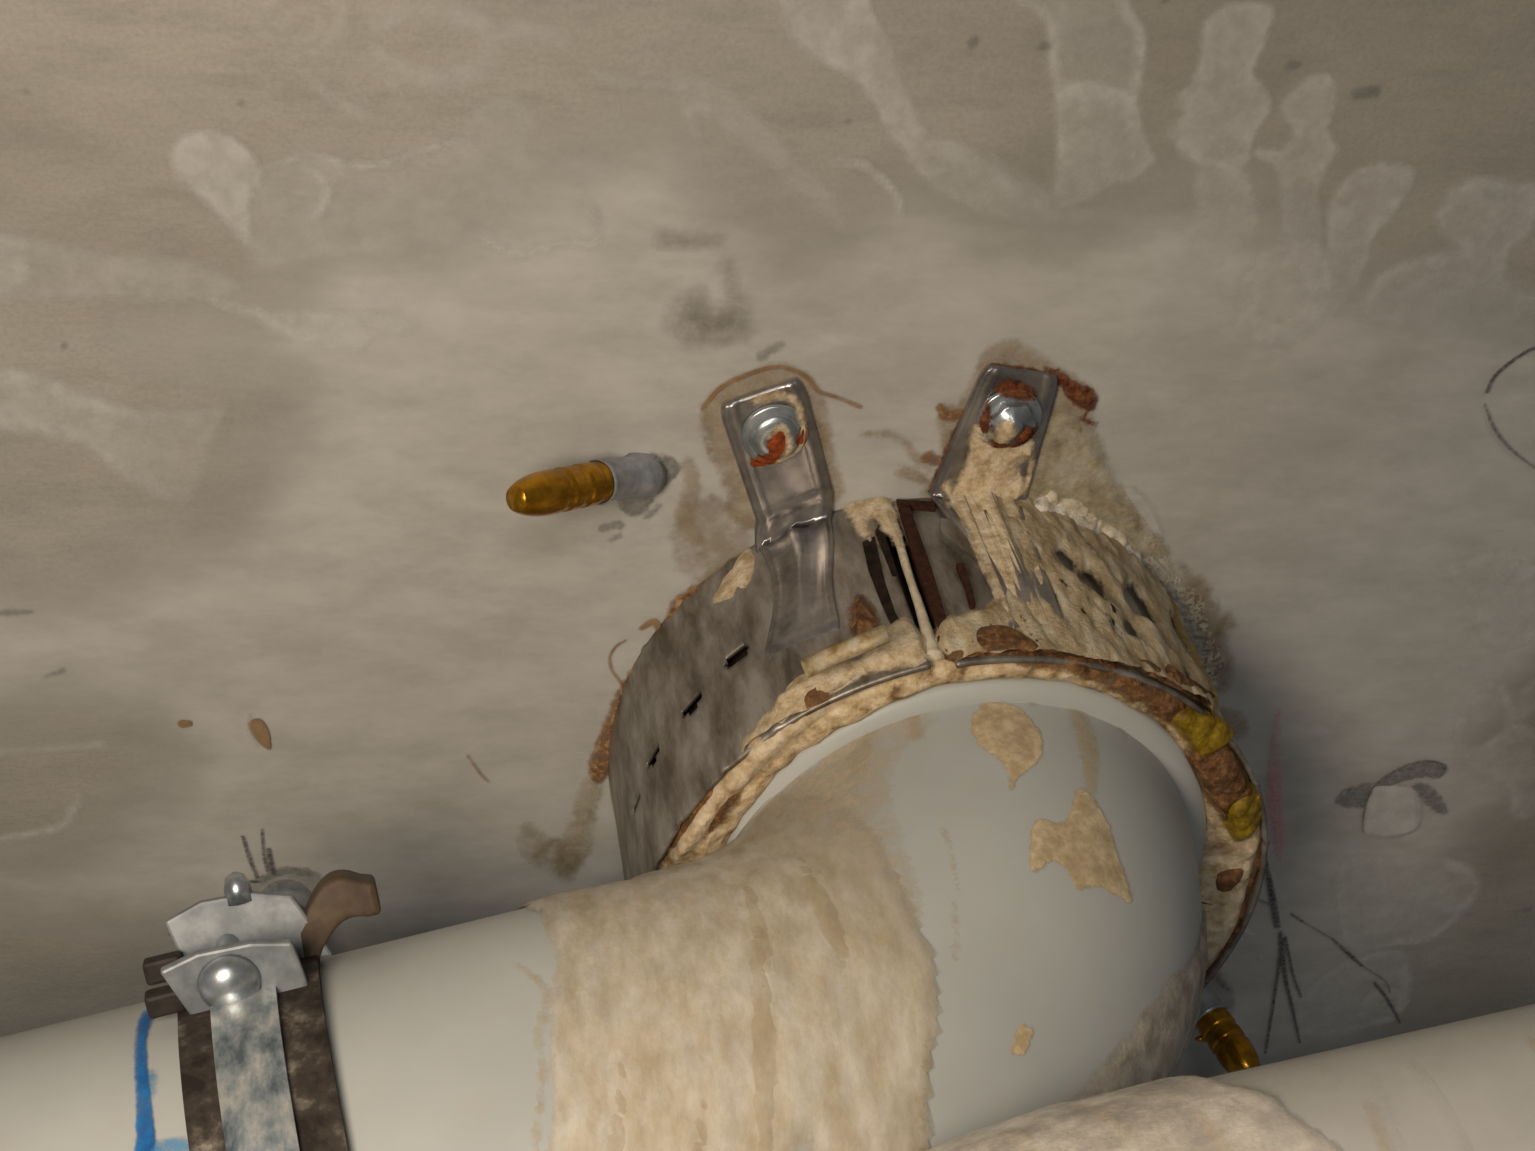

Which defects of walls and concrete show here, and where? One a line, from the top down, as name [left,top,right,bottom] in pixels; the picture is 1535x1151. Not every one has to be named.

water stain [1049,3,1145,161]
water stain [175,134,257,235]
water stain [322,329,375,348]
water stain [1037,417,1063,473]
water stain [1458,552,1505,567]
water stain [1504,553,1535,577]
water stain [1172,595,1218,630]
water stain [1336,891,1352,939]
water stain [1295,1010,1313,1033]
water stain [1177,1029,1223,1074]